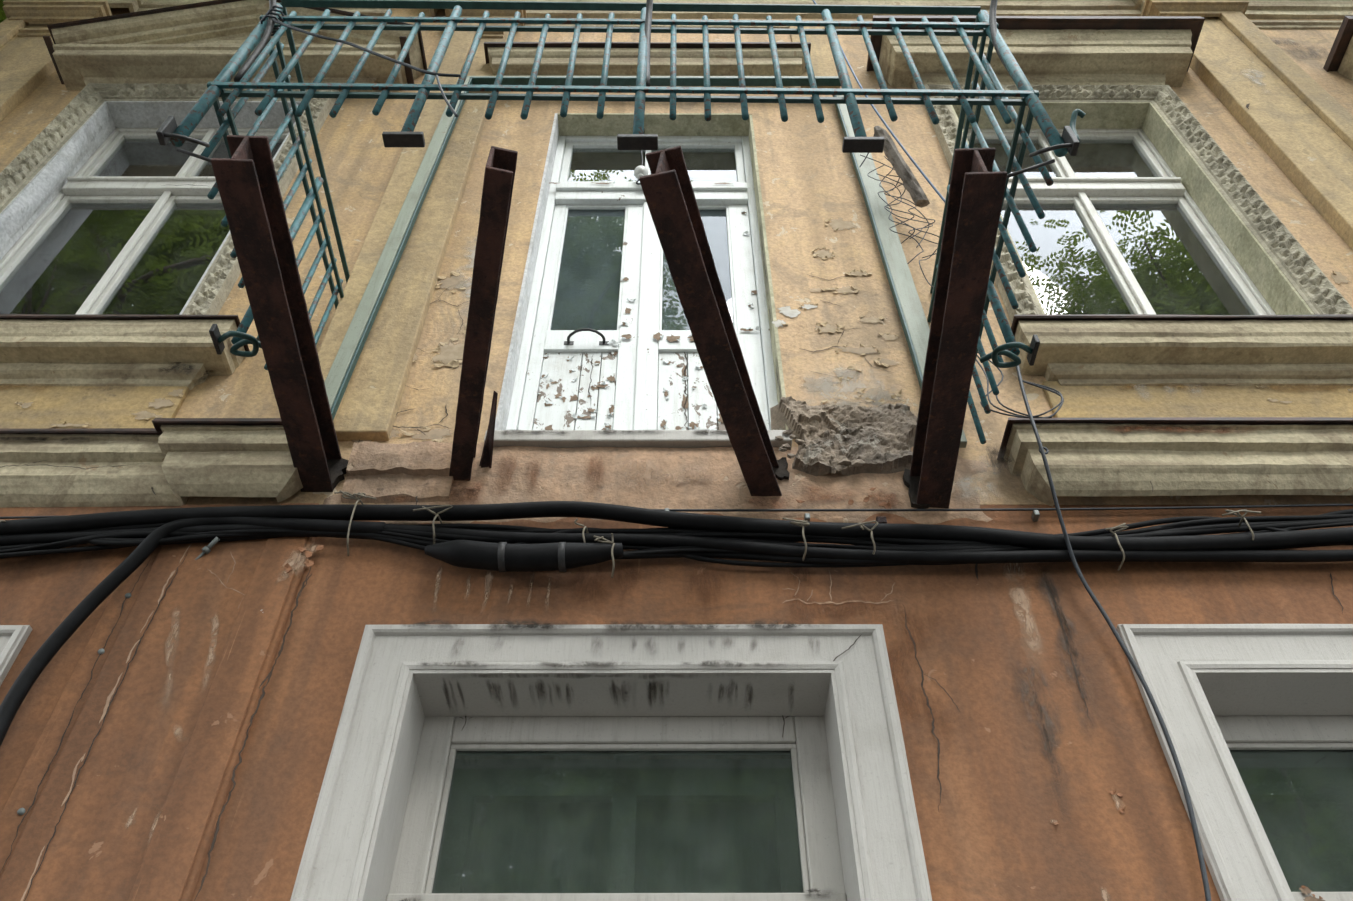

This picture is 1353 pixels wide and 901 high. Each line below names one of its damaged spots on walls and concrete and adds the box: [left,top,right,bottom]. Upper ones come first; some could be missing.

peeling [538,298,636,430]
peeling [653,332,694,342]
peeling [660,360,723,430]
spalling [740,268,930,509]
damp [1006,563,1038,648]
crack [194,567,312,901]
damp [509,662,619,695]
crack [783,572,959,811]